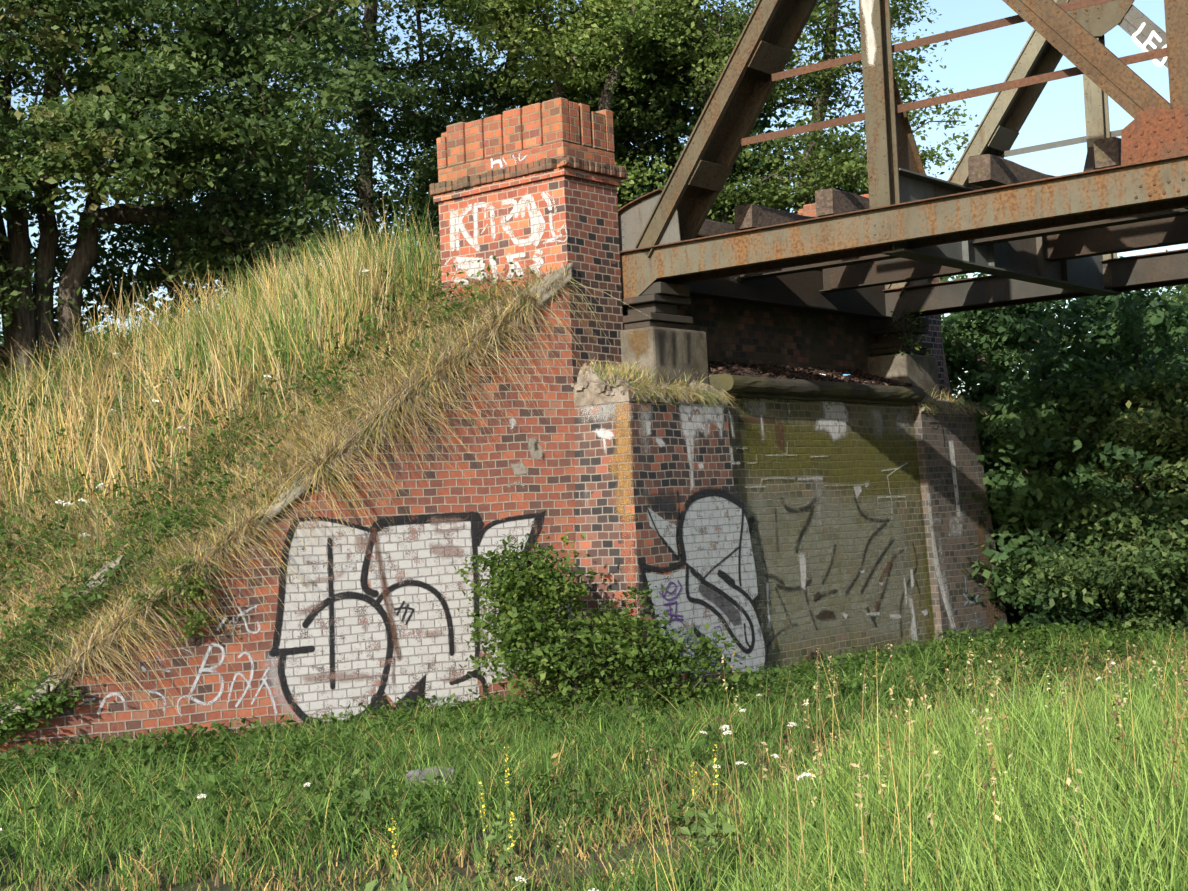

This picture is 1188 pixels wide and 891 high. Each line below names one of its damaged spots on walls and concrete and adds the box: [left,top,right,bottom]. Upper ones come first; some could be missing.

spalling [571,363,727,406]
damp [679,390,738,489]
damp [816,401,848,439]